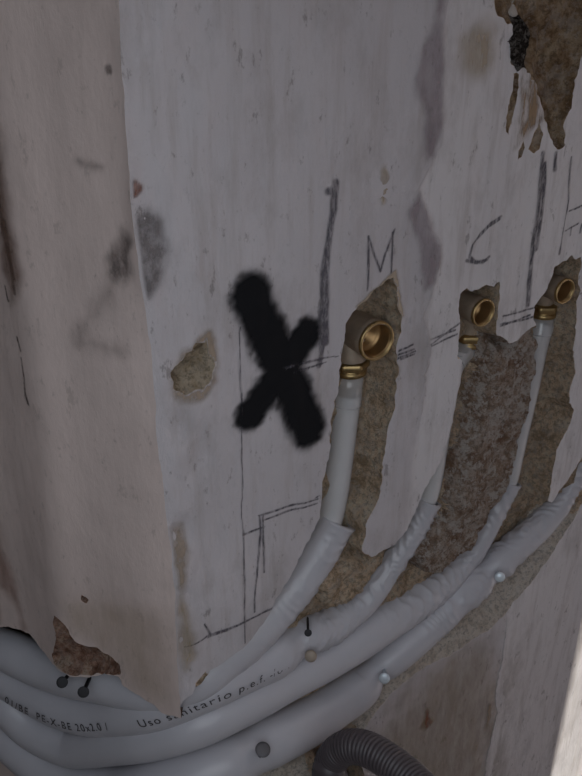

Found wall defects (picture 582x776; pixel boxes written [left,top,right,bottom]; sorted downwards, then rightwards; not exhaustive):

flaking render [494,0,582,159]
spalling [171,332,216,400]
flaking render [408,328,538,573]
flaking render [52,616,121,676]
spalling [352,511,578,776]
spalling [259,754,310,776]